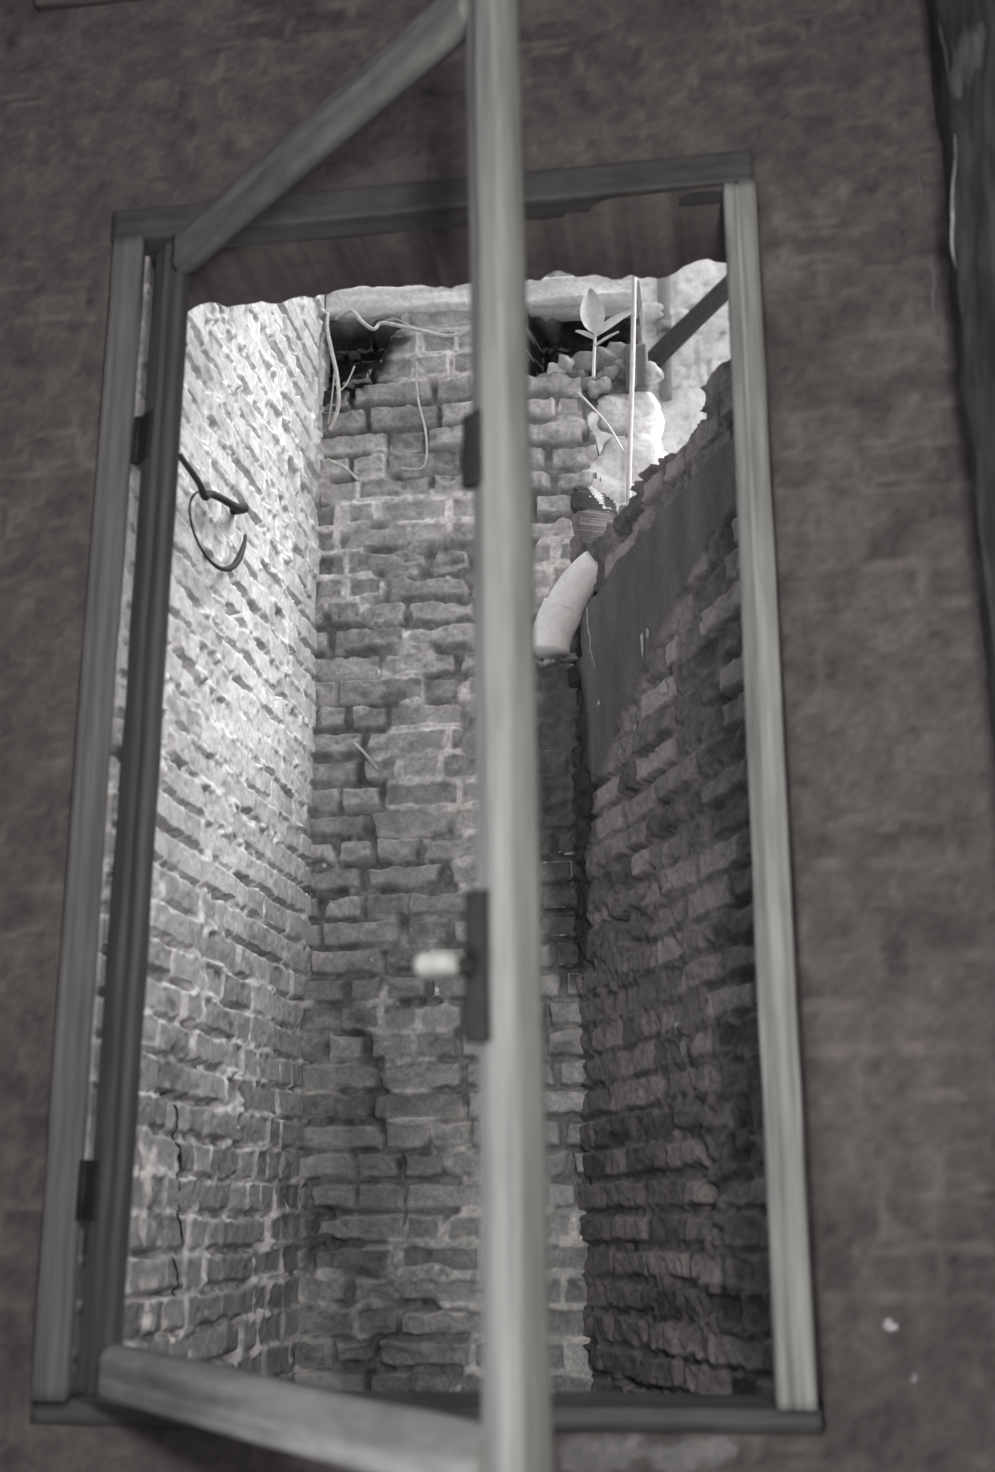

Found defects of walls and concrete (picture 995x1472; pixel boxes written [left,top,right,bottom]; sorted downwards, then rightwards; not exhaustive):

flaking render [938,21,986,101]